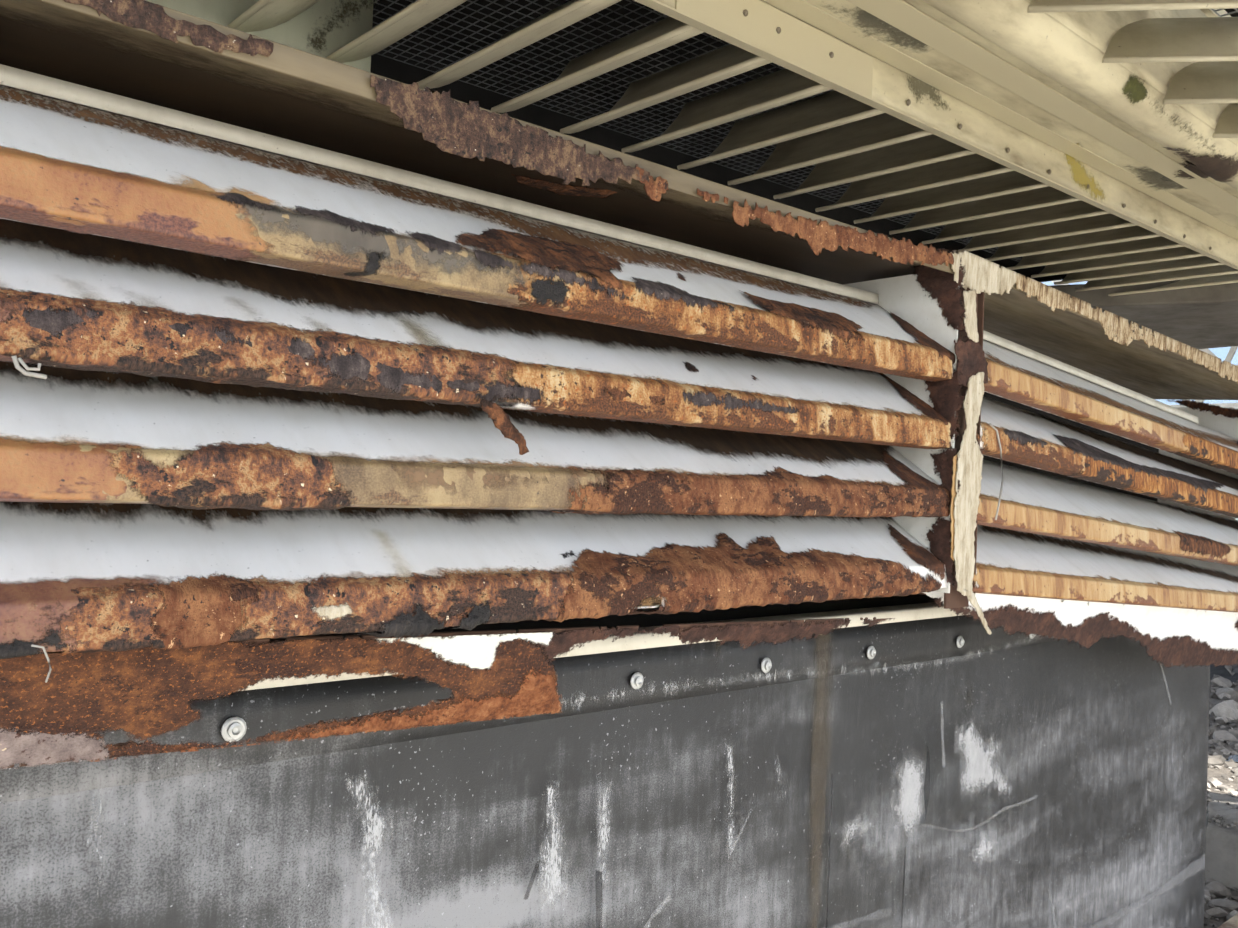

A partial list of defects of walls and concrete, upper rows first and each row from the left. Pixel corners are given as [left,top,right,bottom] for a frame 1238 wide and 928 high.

mould [308,0,377,50]
rust [0,0,966,338]
peeling [950,250,1017,342]
peeling [953,372,992,635]
efflorescence [542,790,562,901]
water stain [599,791,610,867]
efflorescence [891,760,923,829]
efflorescence [959,725,1007,791]